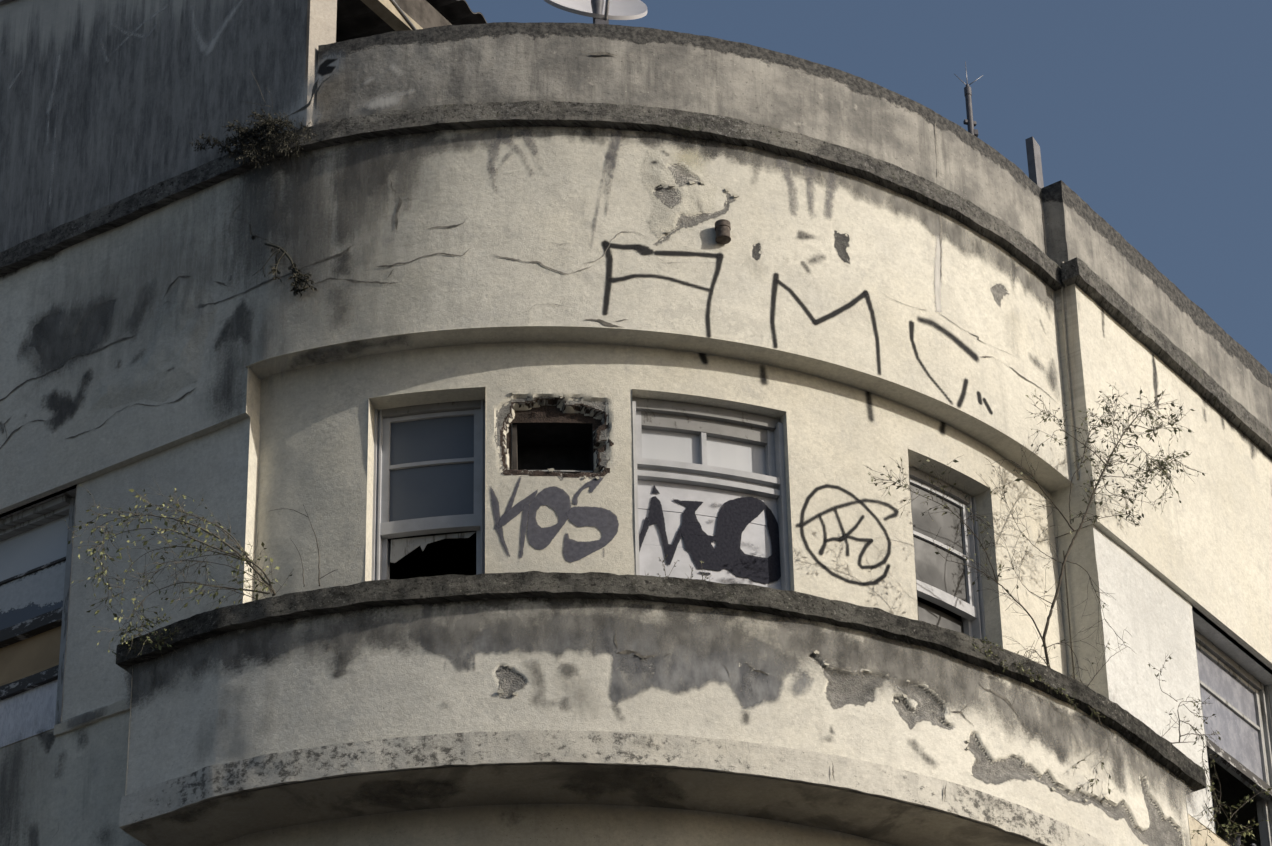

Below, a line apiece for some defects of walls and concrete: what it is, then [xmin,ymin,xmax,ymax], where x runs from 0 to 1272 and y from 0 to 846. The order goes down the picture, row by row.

crack [163,182,468,306]
crack [498,231,721,274]
peeling [652,151,739,245]
peeling [22,296,116,376]
crack [512,304,626,327]
crack [0,329,195,448]
water stain [1184,380,1272,462]
peeling [416,603,953,764]
flaking render [966,734,1182,846]